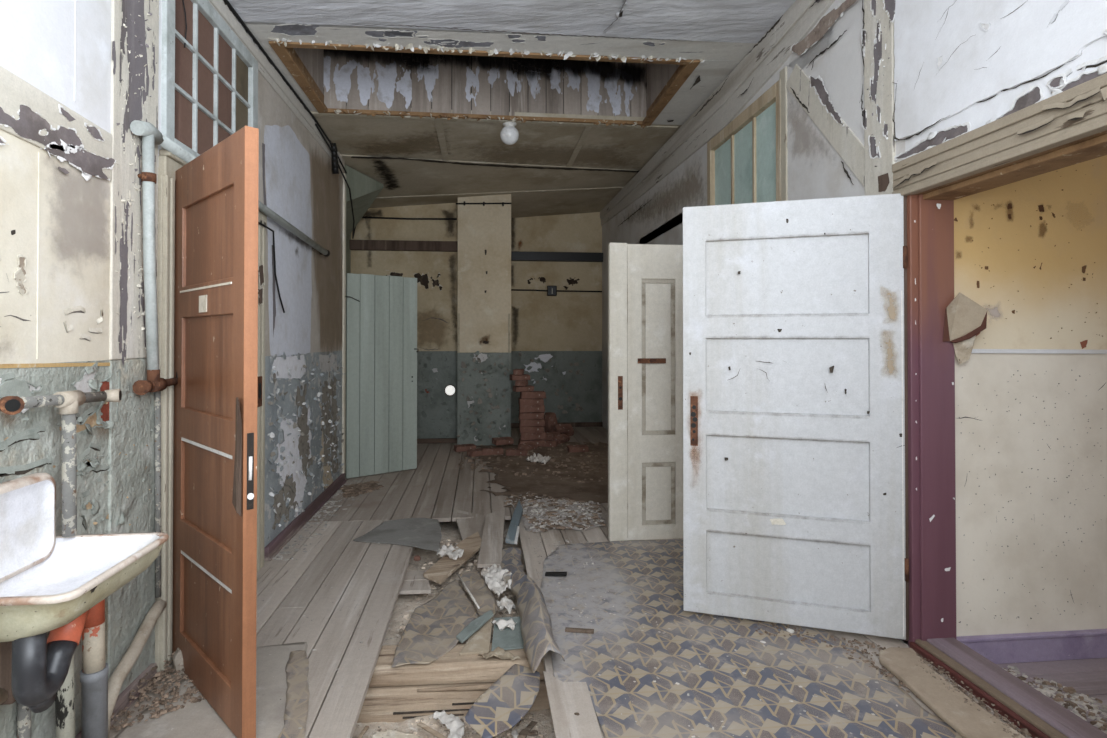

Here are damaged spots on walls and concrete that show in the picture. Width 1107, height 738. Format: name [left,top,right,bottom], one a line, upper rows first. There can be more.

crack [356,0,677,41]
peeling [790,0,857,55]
crack [1047,0,1069,27]
water stain [324,49,647,87]
peeling [809,75,844,127]
peeling [861,0,895,172]
peeling [985,64,1107,125]
crack [1065,54,1107,76]
peeling [894,122,971,161]
peeling [258,125,345,530]
peeling [522,353,568,386]
peeling [77,429,152,531]